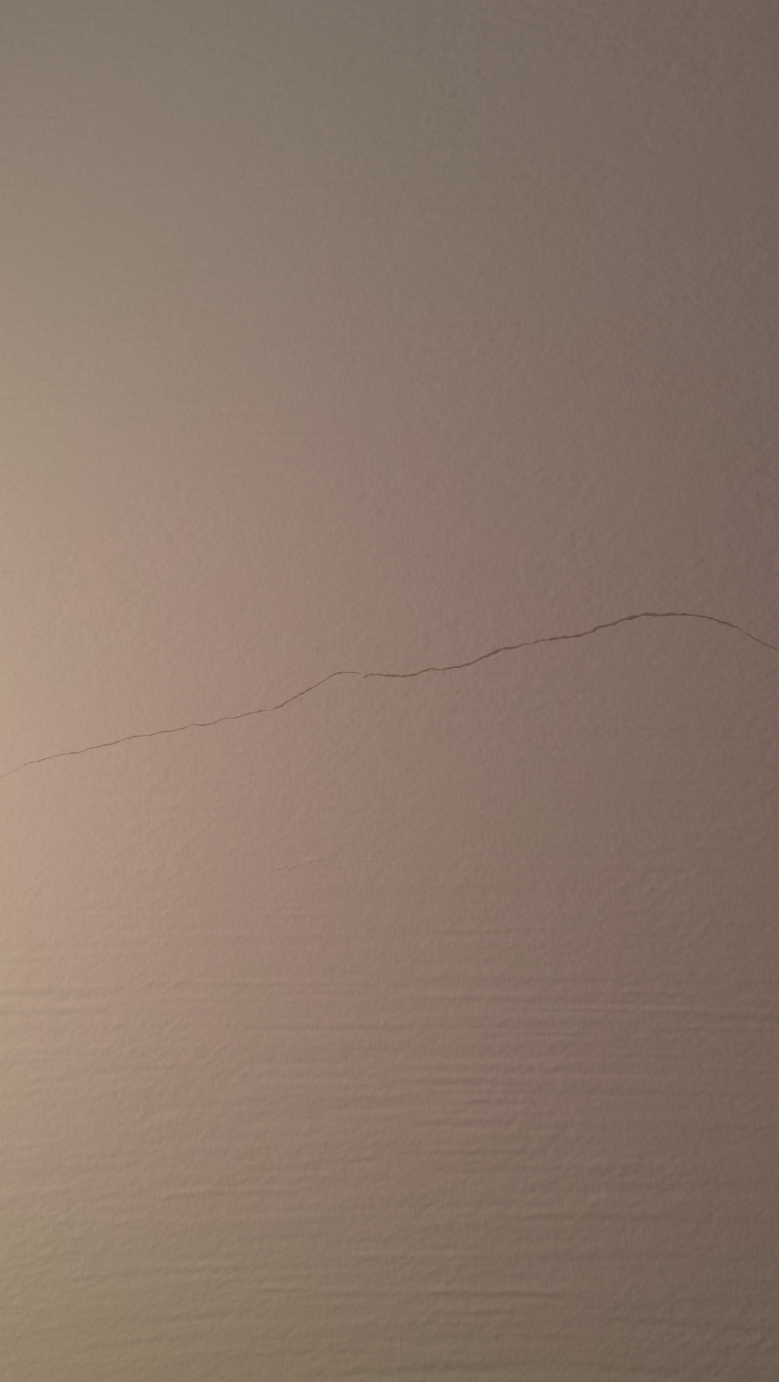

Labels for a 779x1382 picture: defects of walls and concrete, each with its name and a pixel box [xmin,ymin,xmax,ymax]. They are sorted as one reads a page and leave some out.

crack [1,612,779,777]